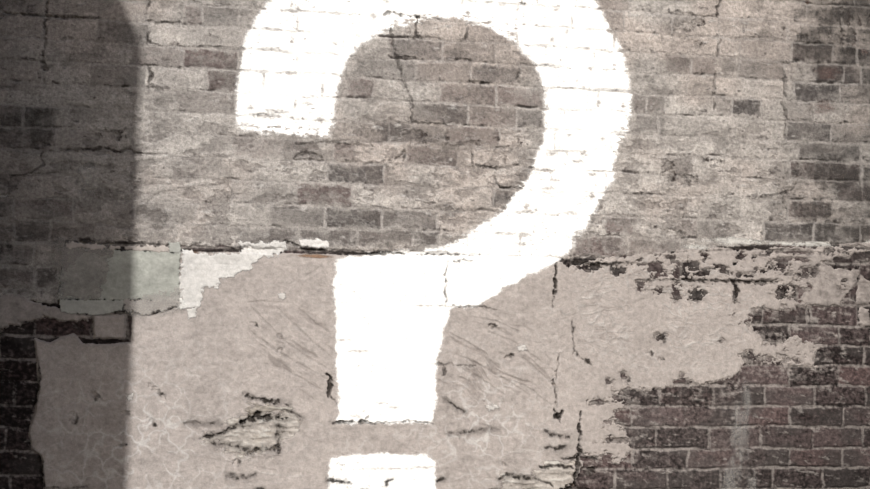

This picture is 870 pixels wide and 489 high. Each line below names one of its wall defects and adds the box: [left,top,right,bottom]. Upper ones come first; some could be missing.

crack [552,260,629,301]
crack [647,278,773,303]
peeling [855,275,870,328]
crack [539,327,598,489]